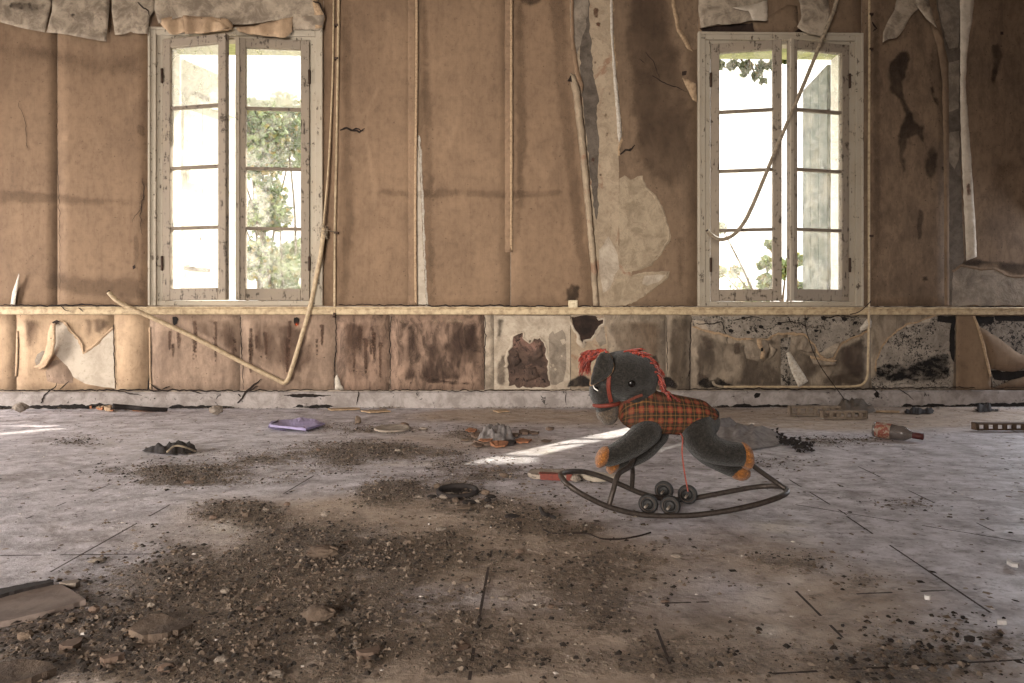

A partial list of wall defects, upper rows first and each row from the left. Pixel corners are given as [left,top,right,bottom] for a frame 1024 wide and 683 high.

peeling [0,0,325,41]
water stain [890,52,923,143]
flaking render [494,0,671,389]
flaking render [871,0,1024,407]
water stain [213,321,304,373]
water stain [346,324,383,377]
water stain [406,323,478,384]
water stain [697,337,767,388]
water stain [771,337,814,386]
water stain [835,341,863,383]